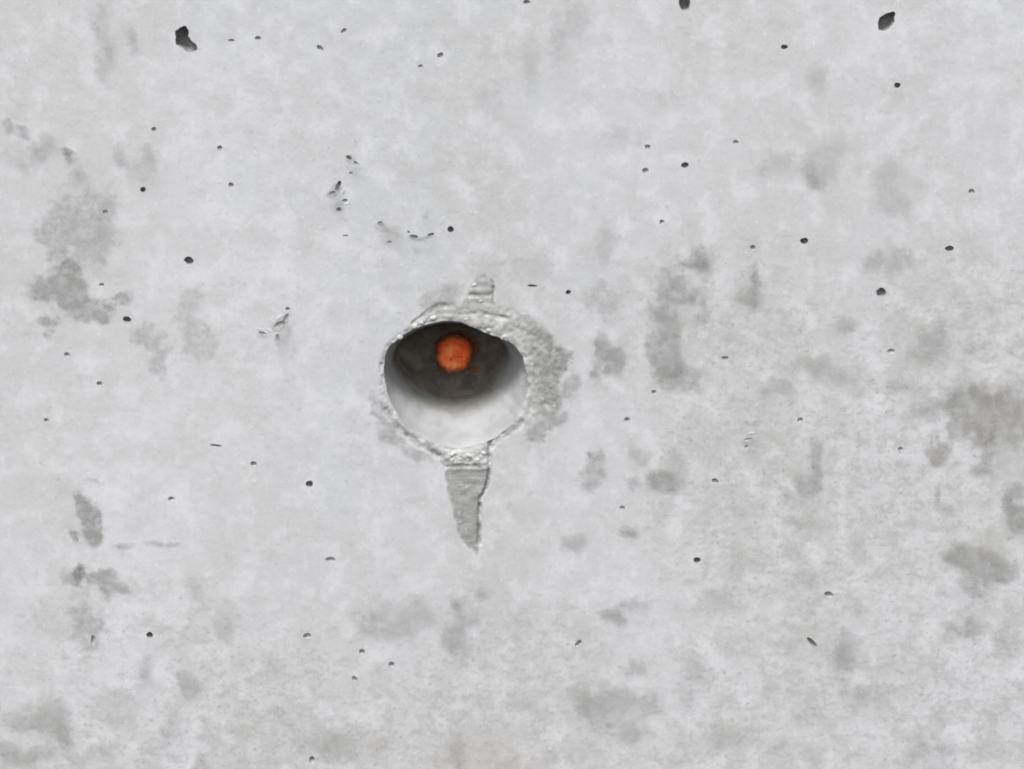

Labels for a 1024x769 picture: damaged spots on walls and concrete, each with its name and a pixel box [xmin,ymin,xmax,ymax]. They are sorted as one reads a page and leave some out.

spalling [376,273,576,465]